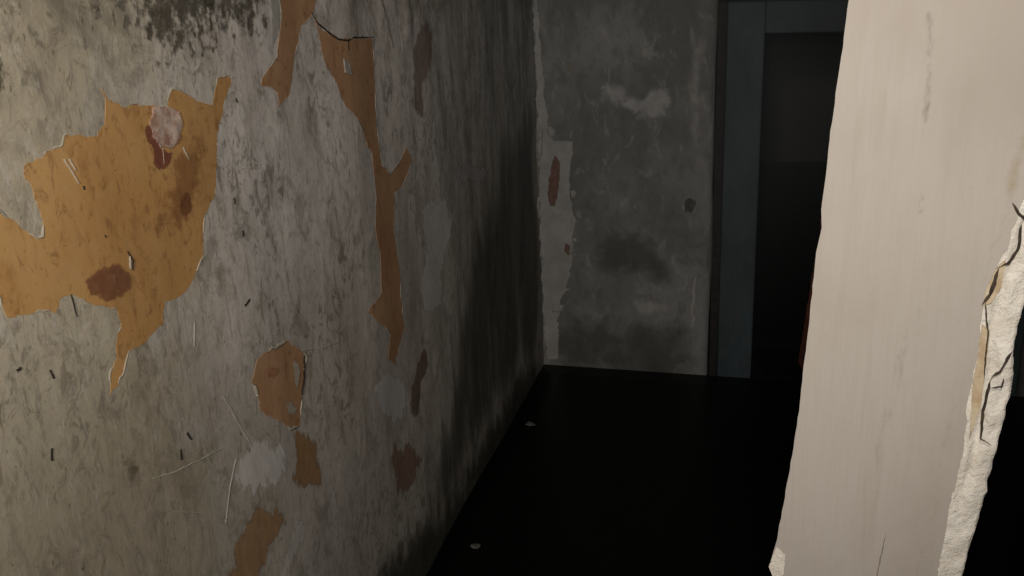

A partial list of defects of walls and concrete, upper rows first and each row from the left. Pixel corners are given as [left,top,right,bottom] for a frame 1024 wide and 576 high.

damp [113,0,267,66]
peeling [0,74,238,394]
peeling [260,0,412,364]
flaking render [421,197,454,313]
peeling [228,340,321,576]